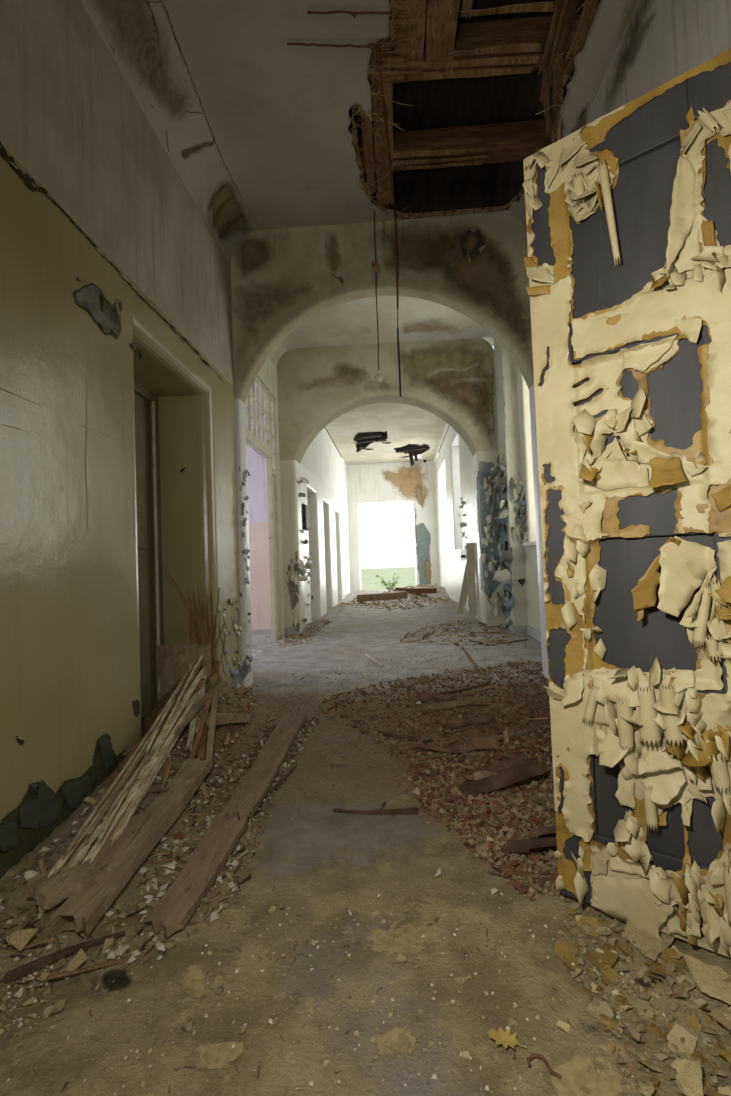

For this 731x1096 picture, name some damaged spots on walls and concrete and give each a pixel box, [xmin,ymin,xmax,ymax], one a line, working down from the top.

leakage [99,0,184,114]
leakage [182,143,212,158]
leakage [209,185,268,271]
peeling [651,106,731,290]
leakage [401,346,489,431]
peeling [621,318,702,371]
peeling [577,406,707,490]
peeling [286,519,313,632]
peeling [459,453,527,628]
peeling [631,536,727,642]
peeling [0,733,127,879]
peeling [596,727,707,827]